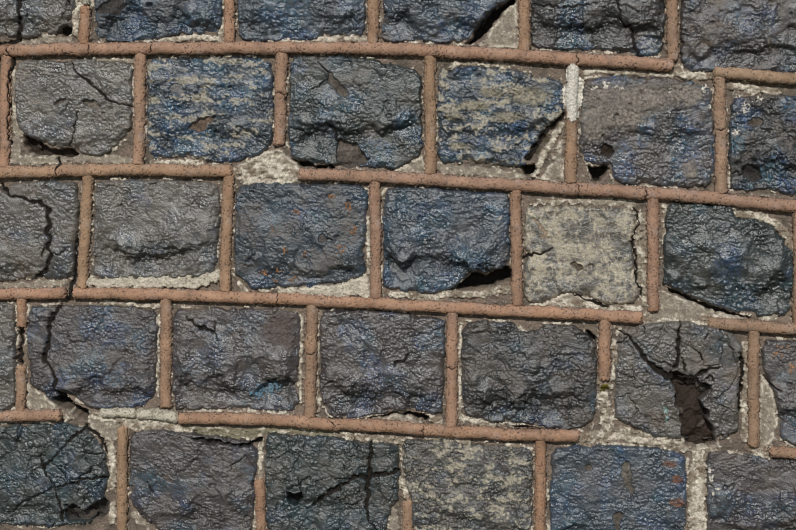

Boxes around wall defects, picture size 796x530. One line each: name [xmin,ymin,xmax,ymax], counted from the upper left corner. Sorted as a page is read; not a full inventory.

crack [72,41,129,106]
water stain [445,88,502,119]
water stain [493,112,520,123]
water stain [514,89,547,105]
crack [528,114,564,158]
water stain [561,63,707,142]
crack [3,185,79,395]
crack [617,323,720,381]
spalling [670,371,713,444]
crack [736,353,744,410]
crack [39,425,107,520]
crack [298,437,399,530]